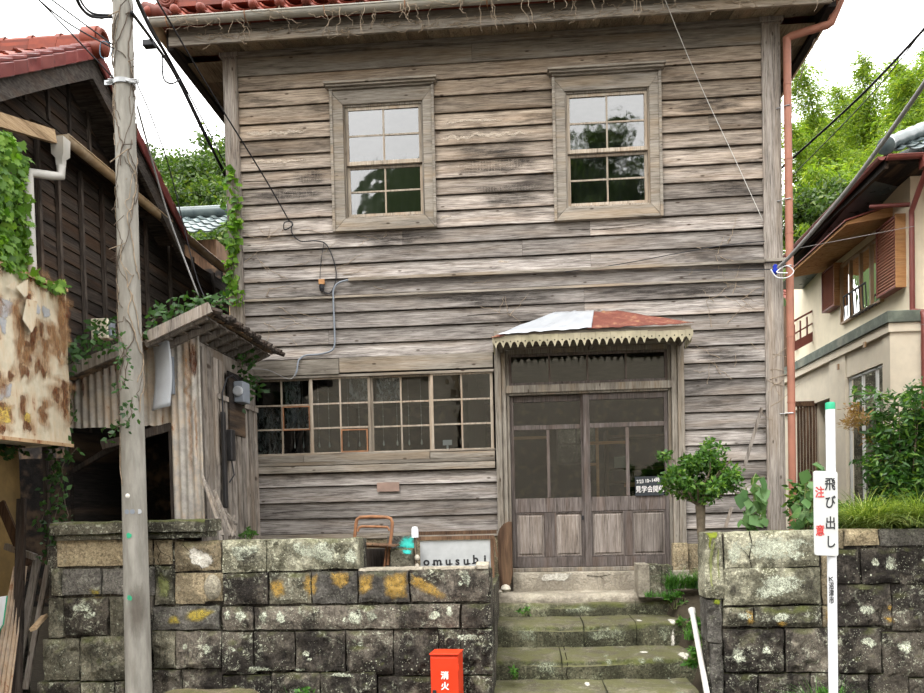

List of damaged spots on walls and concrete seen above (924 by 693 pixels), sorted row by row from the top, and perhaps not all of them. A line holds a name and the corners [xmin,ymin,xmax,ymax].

rust [0,267,84,432]